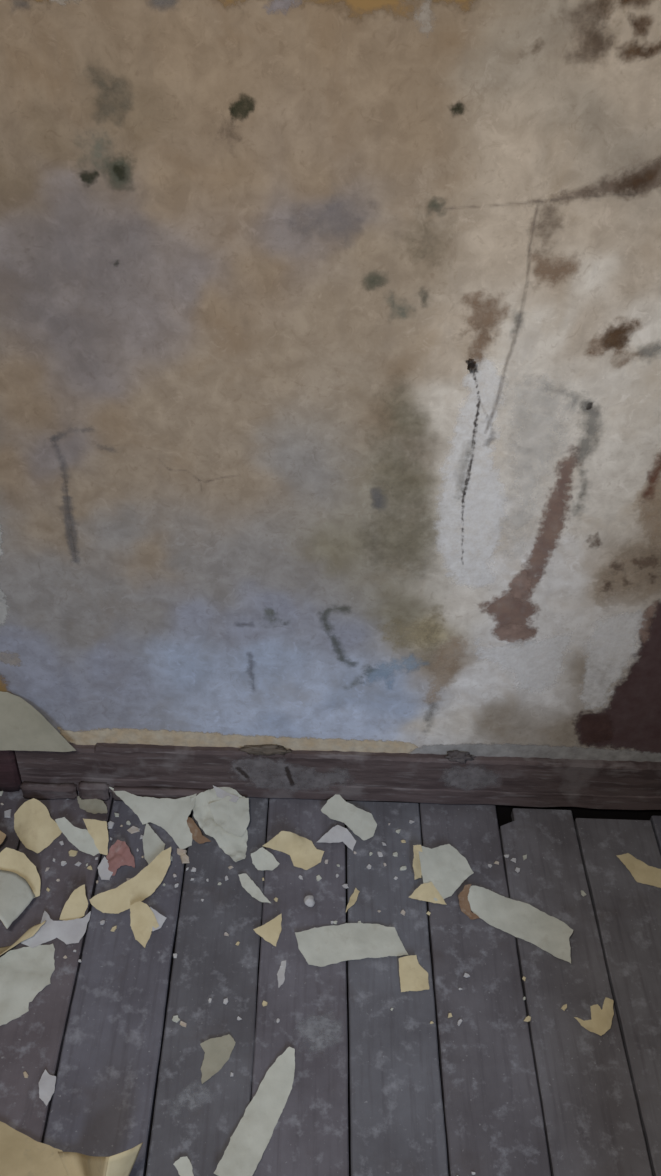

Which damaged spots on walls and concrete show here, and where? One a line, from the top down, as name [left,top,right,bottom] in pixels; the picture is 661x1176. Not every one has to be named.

damp [80,160,129,185]
damp [230,96,254,118]
peeling [0,0,661,762]
crack [462,360,480,530]
corrosion [480,403,599,642]